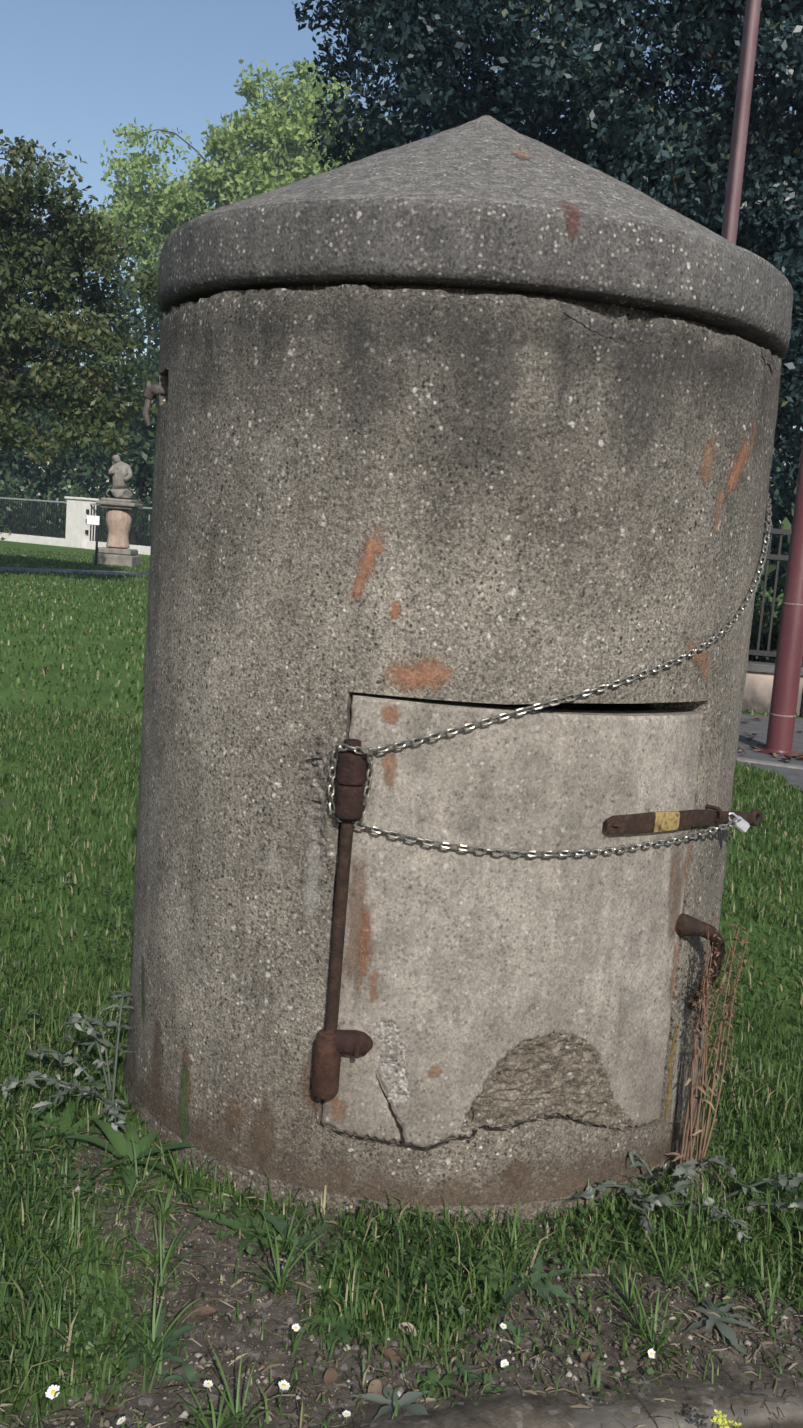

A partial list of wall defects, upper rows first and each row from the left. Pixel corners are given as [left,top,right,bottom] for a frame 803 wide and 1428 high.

corrosion [701,420,756,533]
corrosion [351,537,383,596]
corrosion [385,659,452,691]
corrosion [382,706,401,724]
corrosion [383,753,397,787]
corrosion [359,912,379,1000]
spalling [371,1020,410,1103]
crack [311,1074,605,1152]
spalling [461,1031,633,1132]